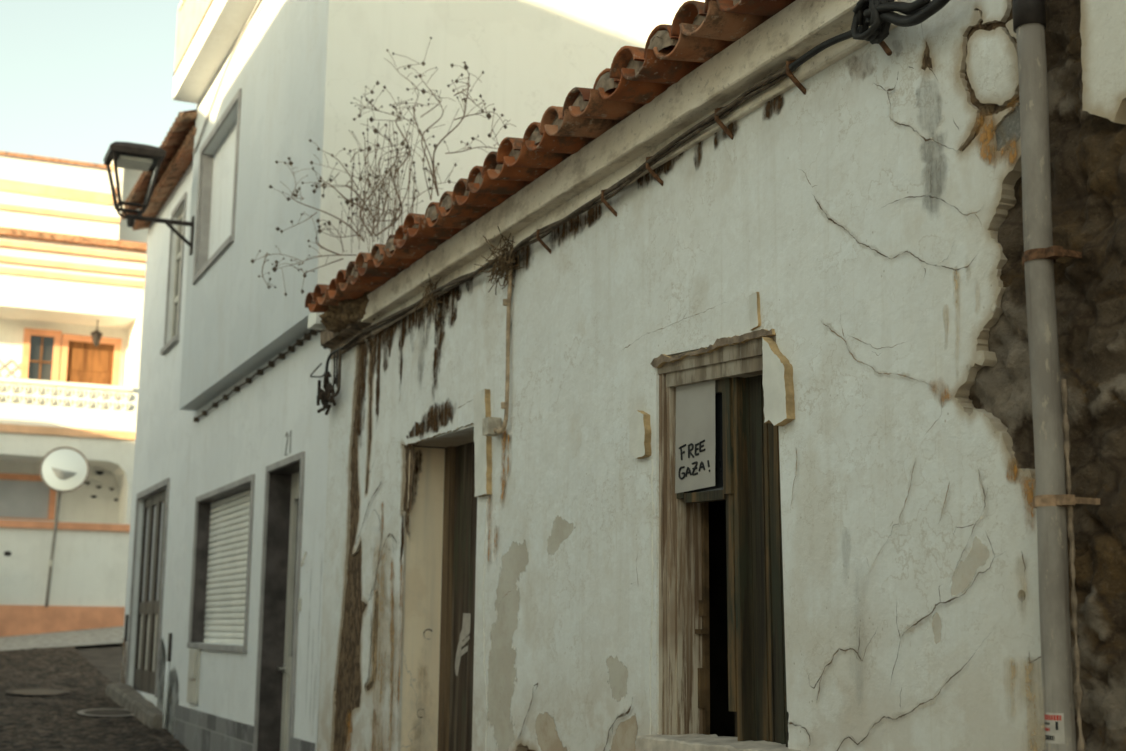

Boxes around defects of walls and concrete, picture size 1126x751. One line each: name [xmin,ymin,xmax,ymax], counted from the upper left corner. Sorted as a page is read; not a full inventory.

corrosion [978,117,1017,164]
crack [803,171,981,276]
damp [357,278,473,444]
damp [400,399,453,561]
spalling [636,410,652,459]
crack [824,317,942,432]
spalling [966,173,1035,469]
corrosion [1007,462,1034,517]
spalling [1045,0,1126,751]
peeling [487,540,528,751]
crack [812,473,994,751]
peeling [528,712,567,751]